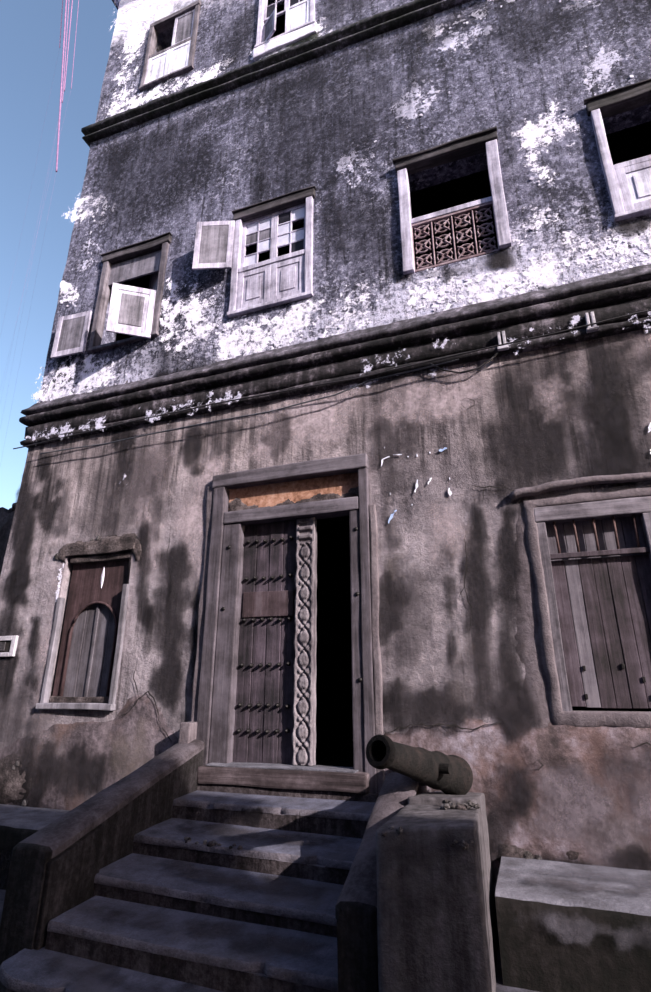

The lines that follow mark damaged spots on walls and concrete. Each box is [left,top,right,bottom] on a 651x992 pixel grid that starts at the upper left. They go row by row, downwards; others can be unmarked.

peeling [511,101,585,186]
peeling [402,205,651,319]
peeling [159,277,387,361]
peeling [26,415,106,441]
peeling [33,353,128,403]
peeling [140,390,243,424]
leakage [181,421,223,474]
leakage [82,427,199,713]
leakage [375,343,651,740]
leakage [0,453,108,807]
crack [121,662,171,740]
leakage [487,765,536,862]